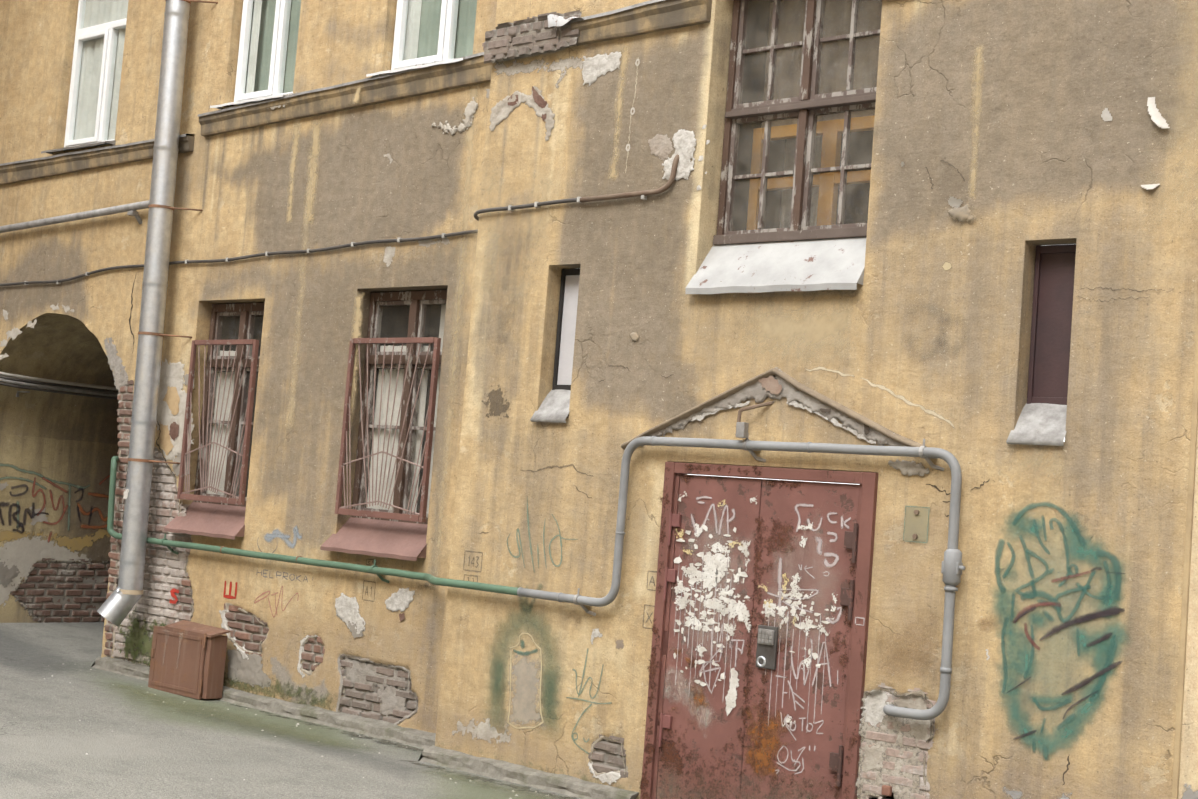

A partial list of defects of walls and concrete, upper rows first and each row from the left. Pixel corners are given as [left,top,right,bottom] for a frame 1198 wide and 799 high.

flaking render [432,10,622,141]
spalling [648,125,710,190]
flaking render [0,337,195,666]
corrosion [683,464,801,490]
flaking render [219,603,271,688]
flaking render [297,635,418,725]
corrosion [640,518,857,799]
flaking render [586,733,629,785]
flaking render [855,683,938,799]